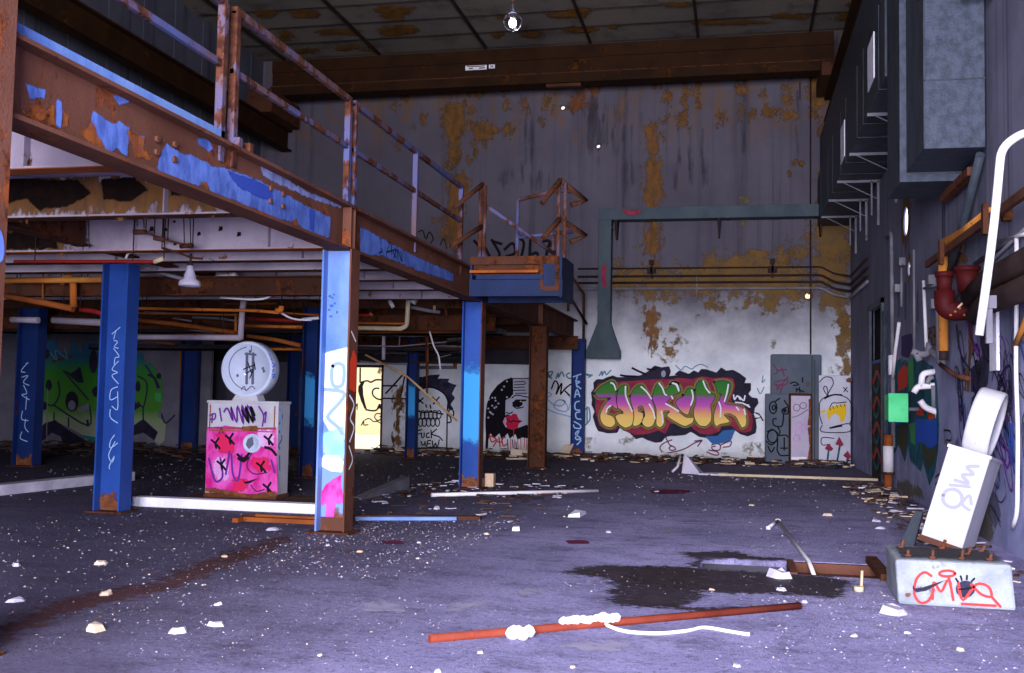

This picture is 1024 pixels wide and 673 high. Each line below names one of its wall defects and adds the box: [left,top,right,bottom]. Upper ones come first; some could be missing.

rust [431,157,473,253]
peeling [409,86,600,171]
rust [640,121,666,207]
rust [612,220,851,376]
rust [100,491,118,510]
leakage [562,550,854,612]